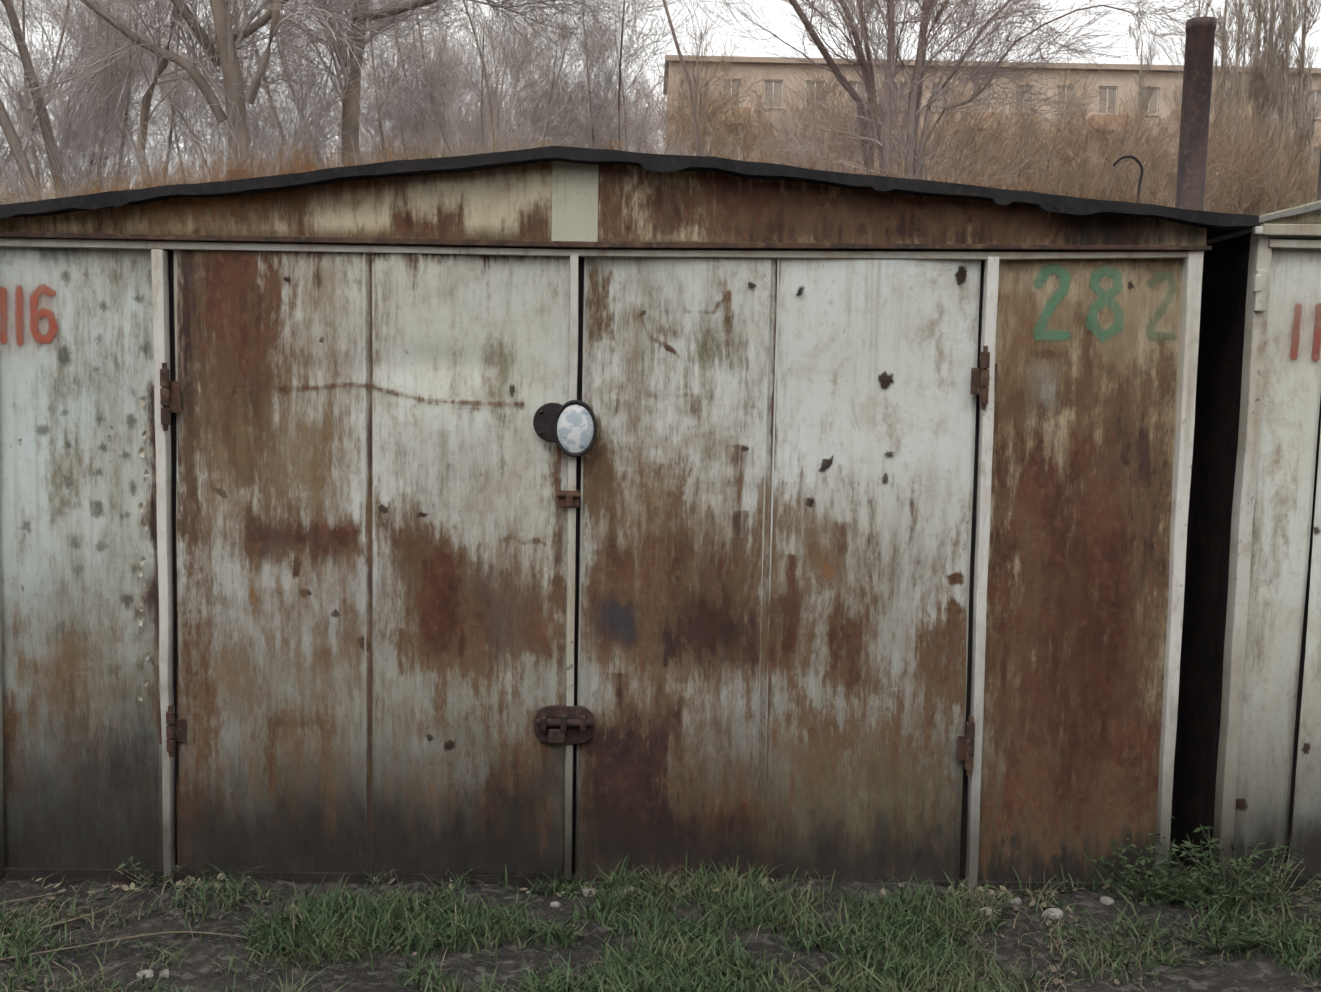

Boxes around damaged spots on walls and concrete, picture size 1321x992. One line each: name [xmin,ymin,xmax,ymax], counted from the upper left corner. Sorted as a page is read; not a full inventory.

rust [598,146,1178,272]
rust [0,142,895,880]
rust [905,561,967,739]
rust [979,304,1173,872]